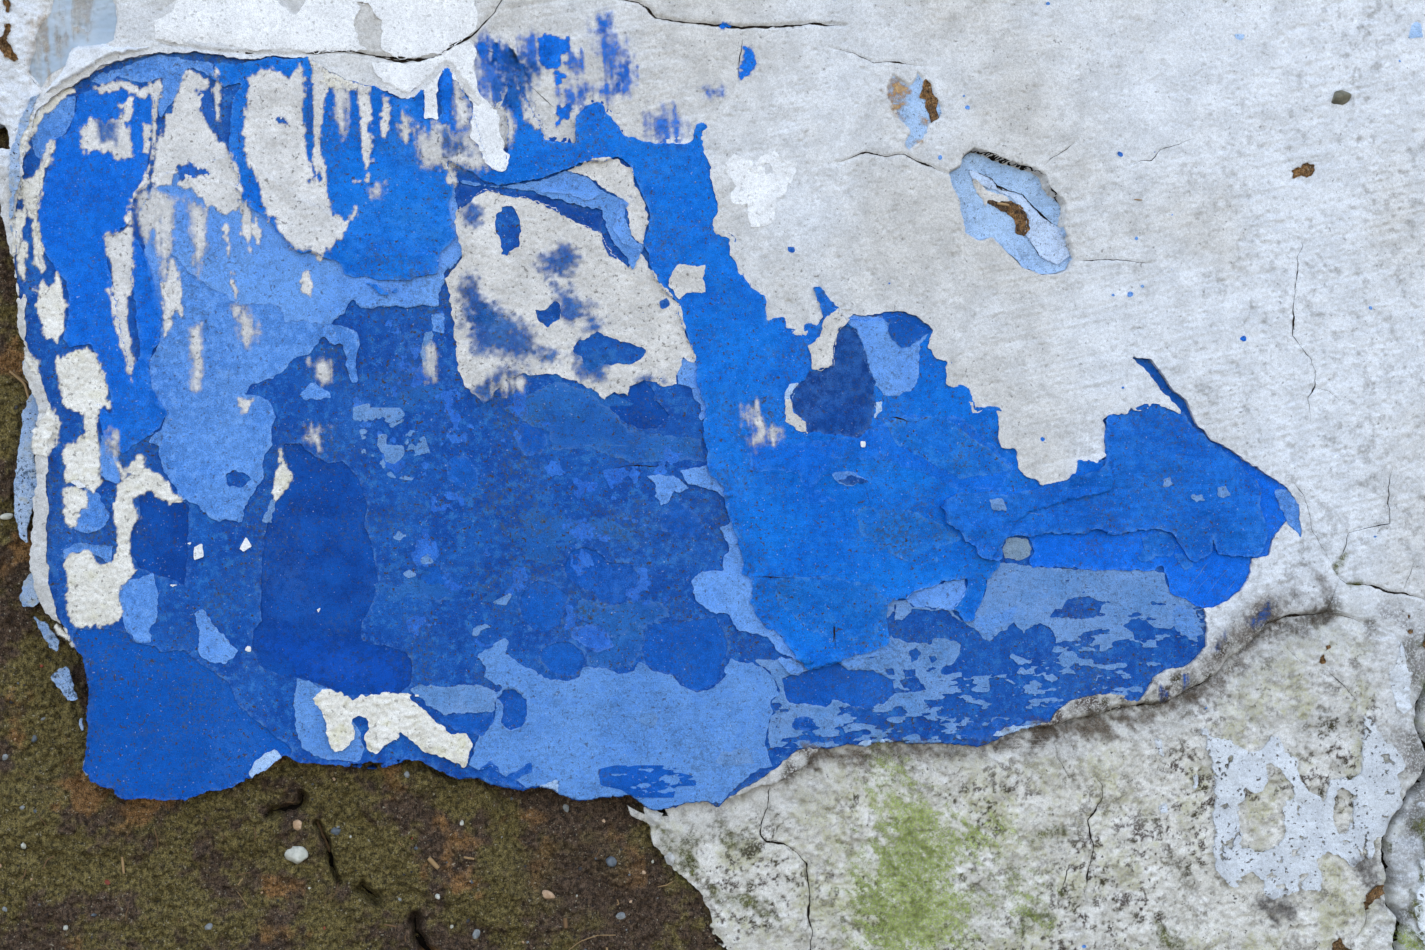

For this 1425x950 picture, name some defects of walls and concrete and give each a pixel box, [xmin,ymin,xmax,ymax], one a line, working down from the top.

spalling [0,0,18,61]
crack [307,0,552,106]
crack [625,0,919,76]
spalling [0,127,10,149]
peeling [9,0,1301,812]
spalling [0,204,727,950]
crack [1268,475,1423,698]
peeling [1389,615,1425,714]
crack [1402,699,1425,801]
crack [759,787,813,950]
crack [1056,760,1103,907]
crack [1365,835,1400,950]